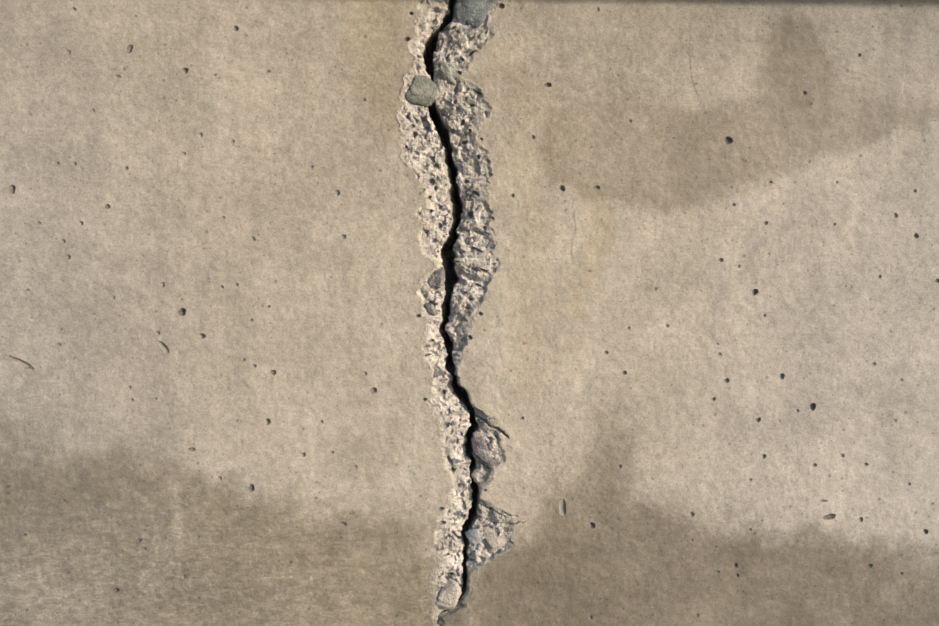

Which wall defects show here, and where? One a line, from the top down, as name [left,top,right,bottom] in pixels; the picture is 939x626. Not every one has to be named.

spalling [395,0,515,626]
leakage [0,387,939,626]
crack [422,0,525,625]
leakage [495,0,939,224]